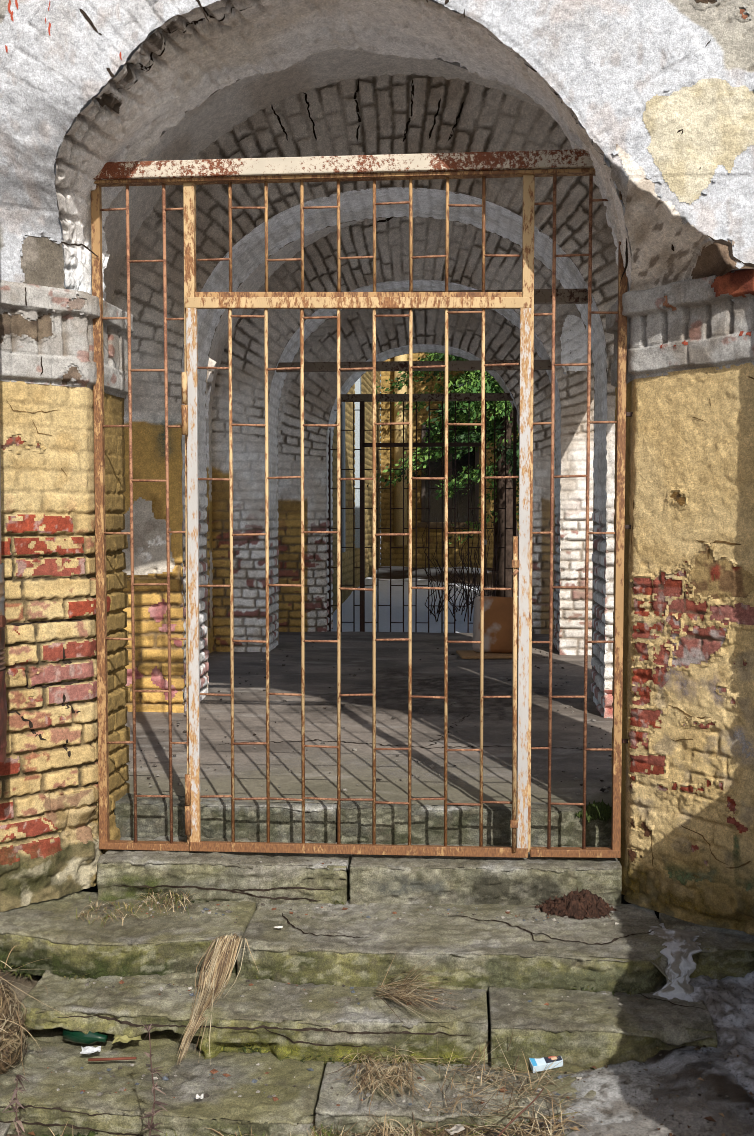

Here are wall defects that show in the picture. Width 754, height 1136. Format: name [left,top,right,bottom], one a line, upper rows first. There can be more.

crack [79,9,102,35]
crack [106,0,252,89]
crack [271,93,317,140]
crack [353,79,361,141]
crack [403,79,464,142]
peeling [612,78,754,315]
peeling [1,514,85,578]
peeling [68,596,111,618]
peeling [5,639,97,732]
peeling [603,686,613,718]
peeling [628,542,754,837]
crack [440,915,653,945]